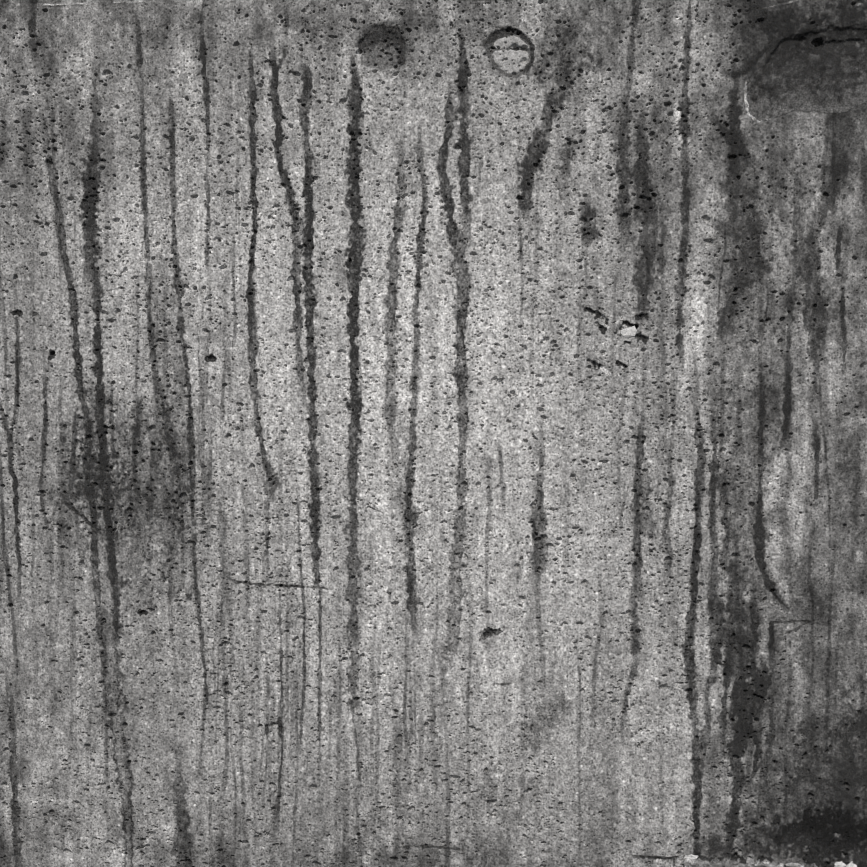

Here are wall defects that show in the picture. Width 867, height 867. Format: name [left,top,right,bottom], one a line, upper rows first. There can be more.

water stain [0,350,22,598]
water stain [39,104,214,867]
water stain [199,35,210,136]
water stain [245,59,279,495]
water stain [269,50,322,746]
water stain [344,62,366,638]
water stain [386,174,405,335]
water stain [403,155,428,617]
water stain [436,35,472,556]
water stain [516,29,602,211]
water stain [682,362,867,864]
water stain [786,149,848,364]